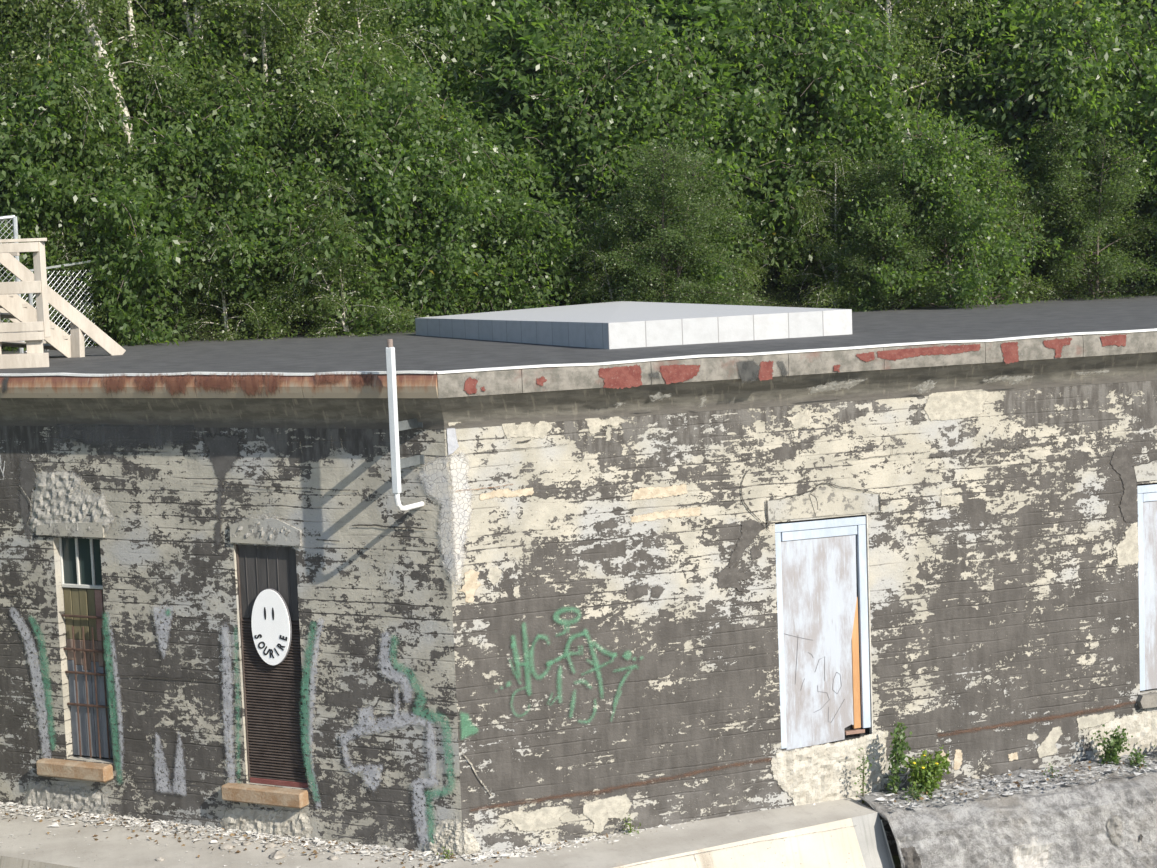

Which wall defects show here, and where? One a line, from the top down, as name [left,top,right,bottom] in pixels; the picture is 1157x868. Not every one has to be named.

corrosion [103,373,283,396]
corrosion [315,373,372,386]
peeling [924,389,990,421]
peeling [502,421,554,439]
peeling [585,416,621,441]
spalling [29,471,114,539]
spalling [419,422,534,603]
peeling [1027,726,1063,758]
spalling [1077,710,1157,758]
spalling [771,730,887,807]
peeling [498,805,568,832]
peeling [583,794,632,833]